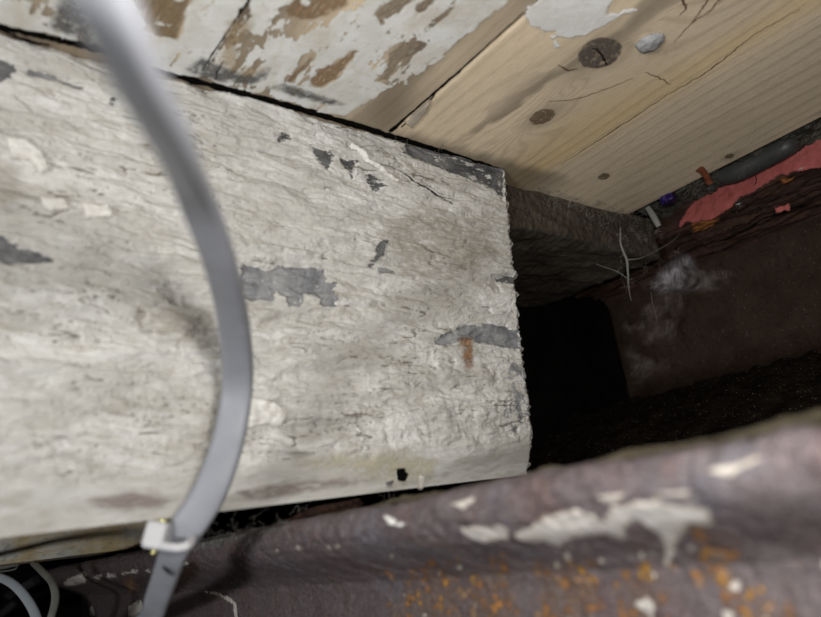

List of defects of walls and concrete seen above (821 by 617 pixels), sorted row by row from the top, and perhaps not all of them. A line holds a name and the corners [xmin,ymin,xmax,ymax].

peeling [0,0,83,41]
peeling [524,0,638,48]
crack [674,0,721,42]
peeling [136,0,508,116]
crack [549,9,800,162]
peeling [312,143,399,192]
peeling [403,143,507,202]
peeling [0,236,52,265]
peeling [241,265,339,307]
rust [461,338,473,368]
rust [405,553,520,617]
rust [688,528,775,617]